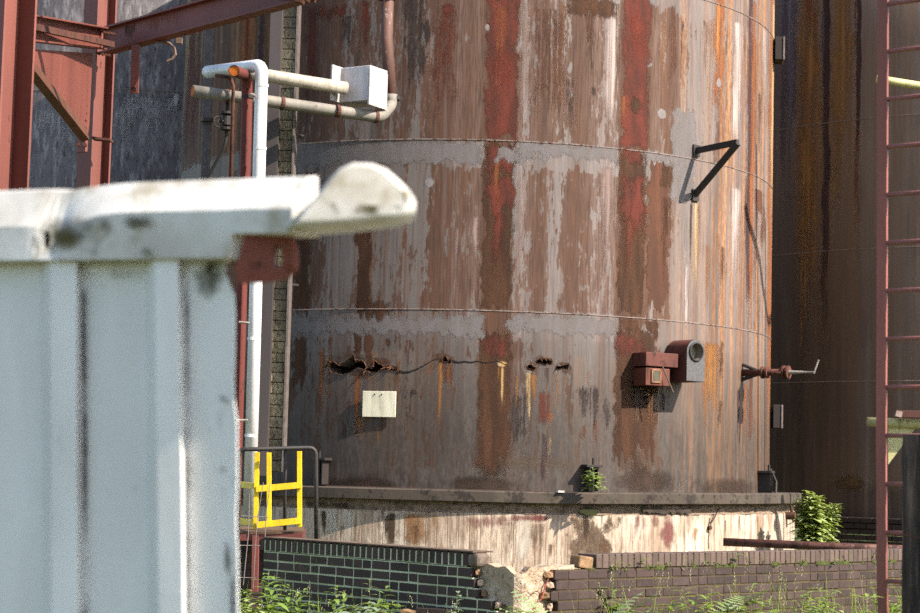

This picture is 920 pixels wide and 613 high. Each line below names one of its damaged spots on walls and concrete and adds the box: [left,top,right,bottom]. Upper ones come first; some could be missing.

peeling [450,0,527,480]
peeling [535,0,680,467]
water stain [381,511,395,544]
water stain [519,523,552,560]